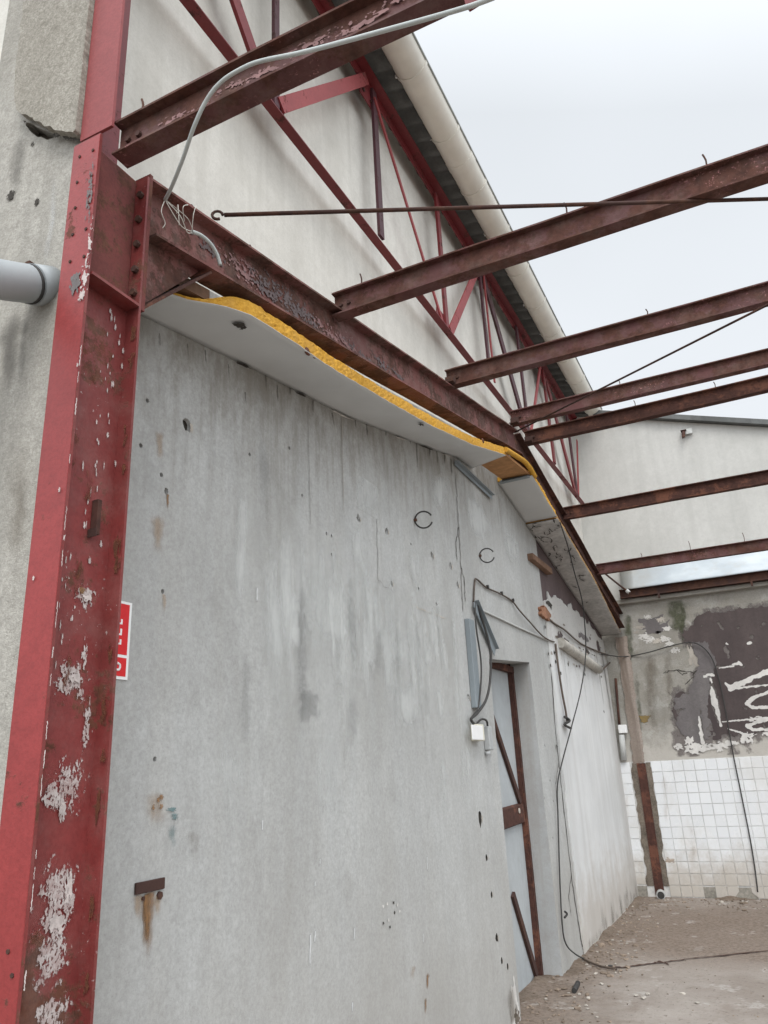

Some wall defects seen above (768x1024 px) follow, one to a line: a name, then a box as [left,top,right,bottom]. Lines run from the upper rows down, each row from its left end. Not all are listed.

peeling [40,507,96,823]
peeling [633,604,768,757]
peeling [23,854,79,1024]
rust [143,892,154,937]